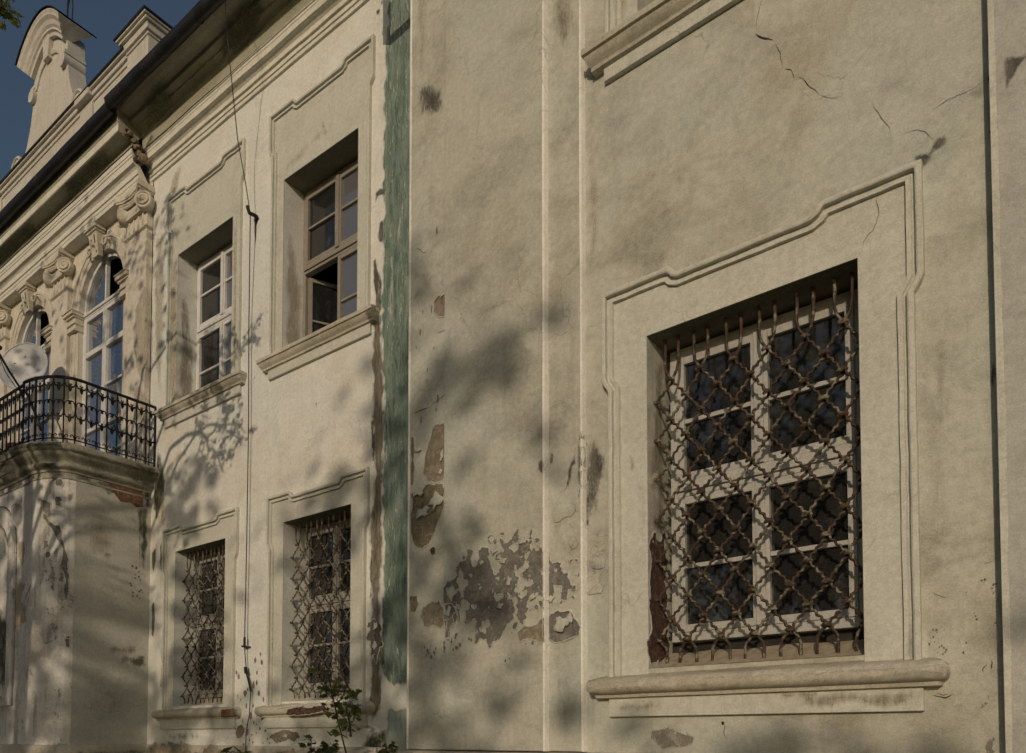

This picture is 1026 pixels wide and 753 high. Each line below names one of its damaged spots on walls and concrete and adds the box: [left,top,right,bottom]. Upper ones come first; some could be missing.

crack [756,3,841,98]
flaking render [422,293,445,319]
leakage [365,0,441,747]
flaking render [410,394,444,550]
leakage [567,436,604,508]
flaking render [42,478,70,608]
leakage [0,583,27,688]
flaking render [409,528,582,659]
flaking render [149,741,223,753]
flaking render [221,653,301,753]
flaking render [277,702,366,716]
flaking render [651,727,694,749]